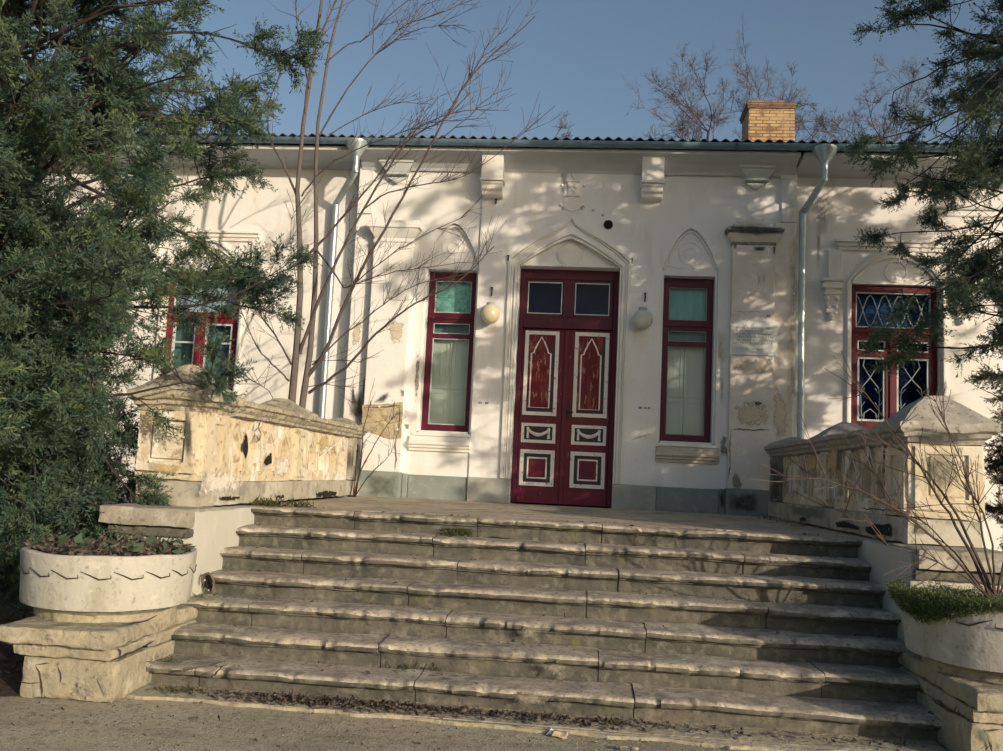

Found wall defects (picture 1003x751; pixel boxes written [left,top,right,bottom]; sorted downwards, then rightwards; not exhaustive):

peeling [387,319,405,342]
flaking render [362,350,420,439]
spalling [835,521,891,537]